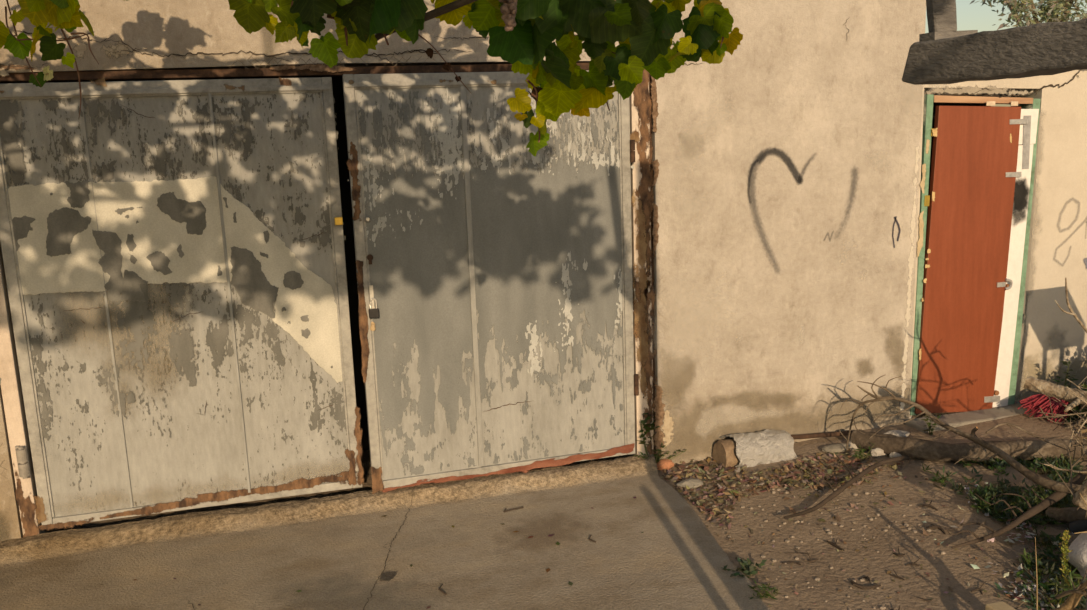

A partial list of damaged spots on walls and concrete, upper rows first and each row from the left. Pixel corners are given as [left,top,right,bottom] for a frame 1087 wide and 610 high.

crack [58,36,488,69]
corrosion [630,69,657,454]
leakage [669,146,920,456]
corrosion [13,464,39,538]
crack [363,486,415,610]